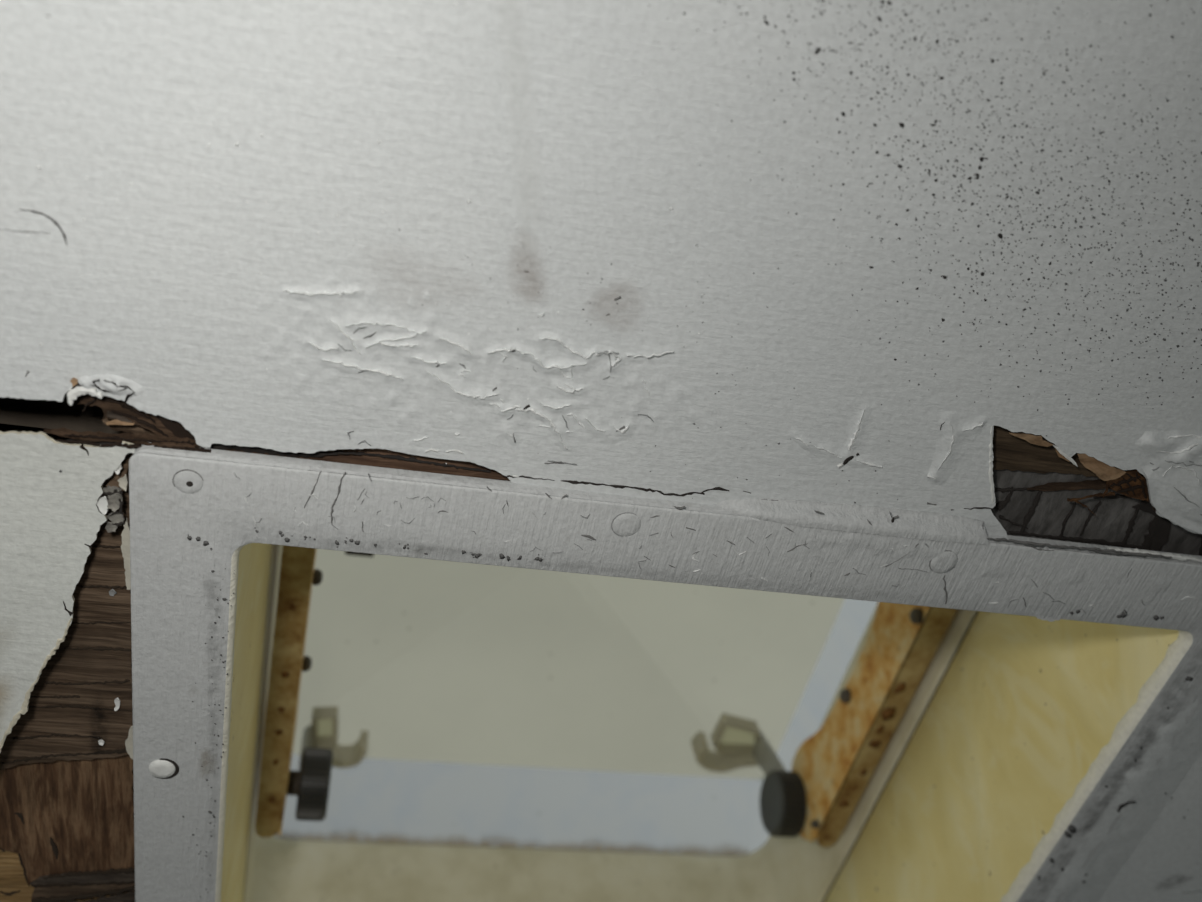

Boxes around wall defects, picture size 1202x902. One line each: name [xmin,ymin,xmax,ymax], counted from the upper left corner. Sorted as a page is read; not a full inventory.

leakage [743,0,1202,409]
crack [338,326,376,373]
crack [597,350,619,379]
crack [63,396,812,581]
peeling [1009,433,1126,481]
crack [814,510,952,604]
peeling [1107,547,1202,563]
peeling [0,431,135,753]
peeling [125,726,133,759]
rust [868,683,906,748]